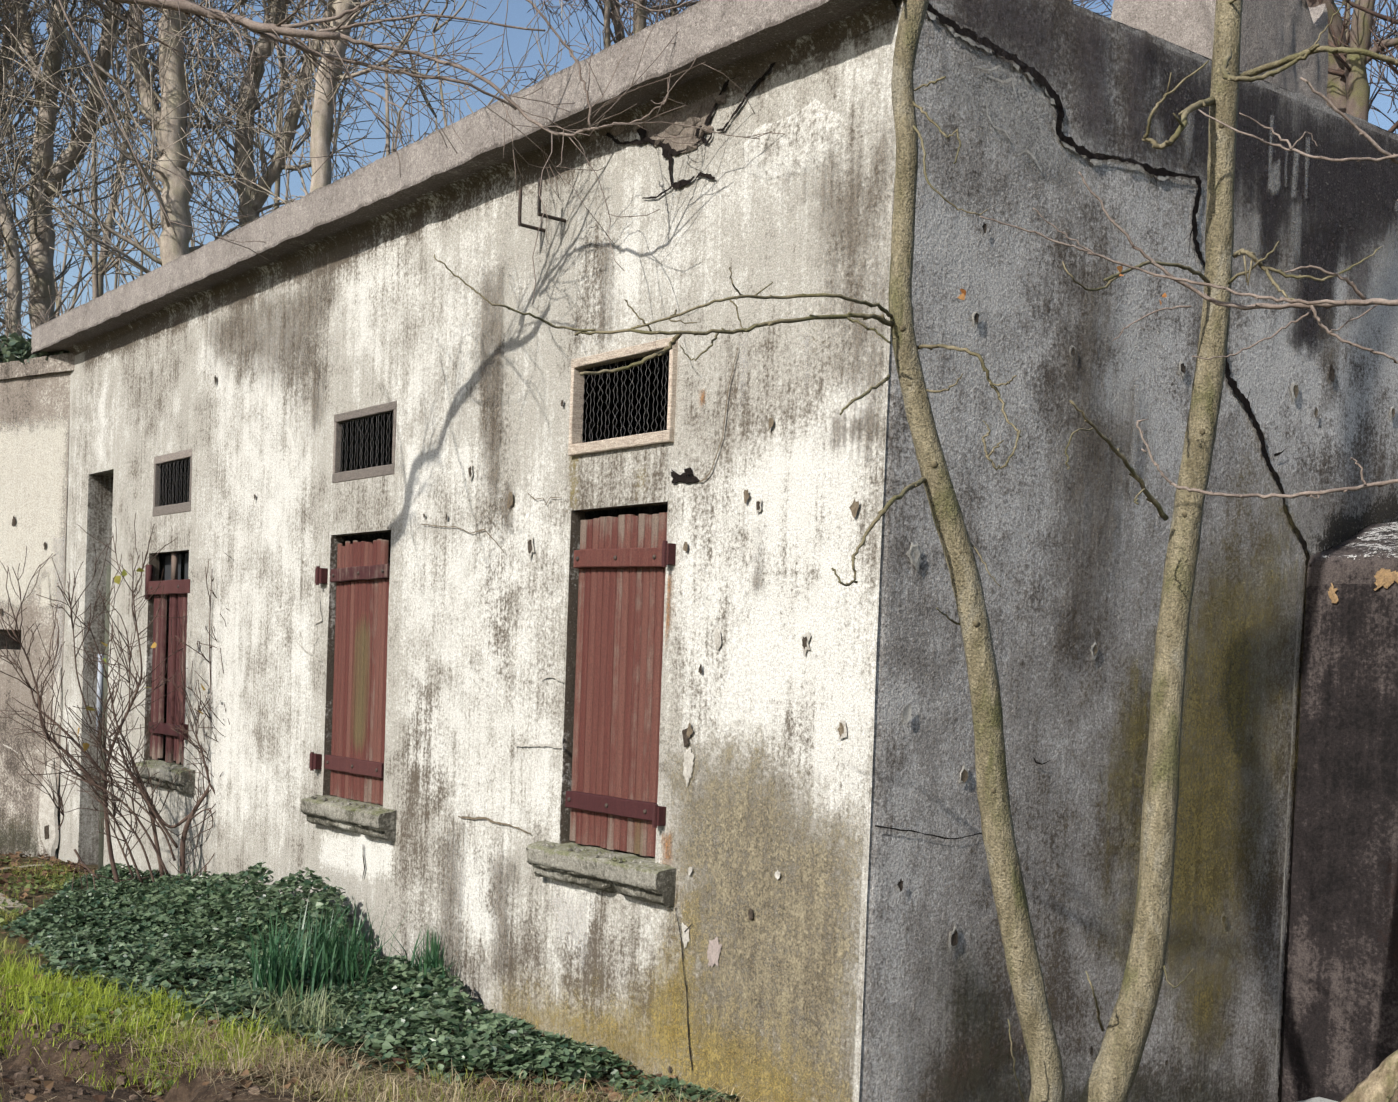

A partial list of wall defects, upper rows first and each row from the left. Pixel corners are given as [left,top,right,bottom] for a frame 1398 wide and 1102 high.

crack [606,62,776,199]
crack [927,3,1205,267]
water stain [1234,81,1398,396]
water stain [480,274,510,525]
water stain [833,417,874,458]
spalling [1328,583,1338,603]
peeling [1323,522,1398,591]
water stain [666,733,864,1102]
crack [875,825,982,839]
crack [1225,354,1310,1102]